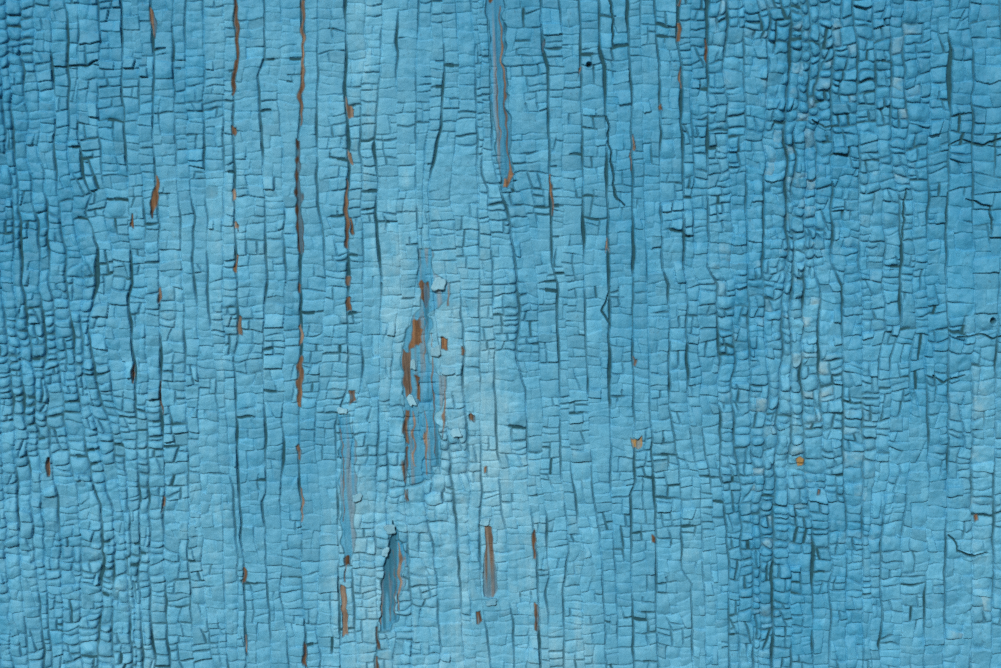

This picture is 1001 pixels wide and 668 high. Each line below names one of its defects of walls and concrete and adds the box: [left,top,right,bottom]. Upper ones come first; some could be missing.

crack [50,0,198,668]
crack [228,0,390,668]
crack [407,50,454,267]
peeling [400,248,462,503]
crack [498,186,570,668]
crack [525,0,735,668]
crack [774,97,849,399]
crack [890,185,911,333]
crack [932,261,1001,485]
crack [937,0,1001,237]
peeling [379,522,411,632]
peeling [476,518,498,625]